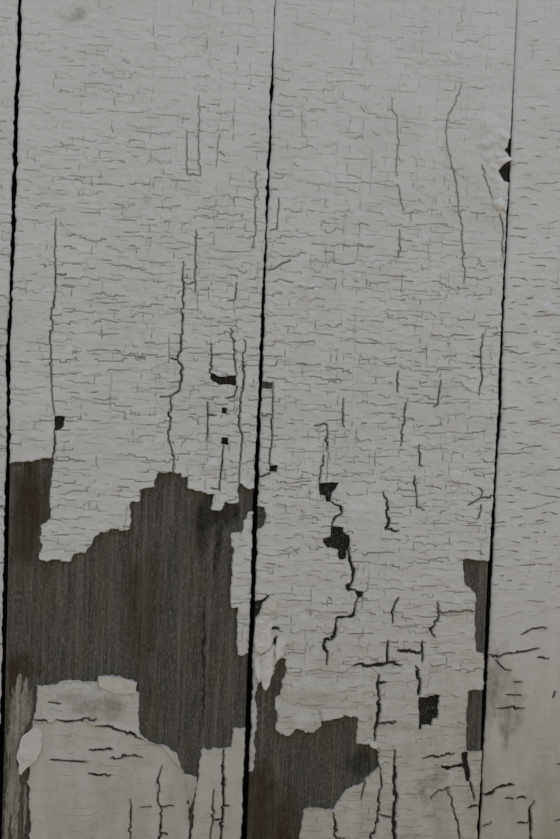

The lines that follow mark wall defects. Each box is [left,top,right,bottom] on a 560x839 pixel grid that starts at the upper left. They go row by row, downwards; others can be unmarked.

crack [167,270,196,460]
crack [383,496,397,532]
crack [37,702,140,776]
peeling [2,458,380,839]
crack [322,544,357,661]
crack [353,611,439,739]
peeling [418,694,439,729]
peeling [463,559,488,653]
crack [128,773,173,839]
crack [209,749,229,839]
crack [361,751,397,839]
crack [451,782,533,839]